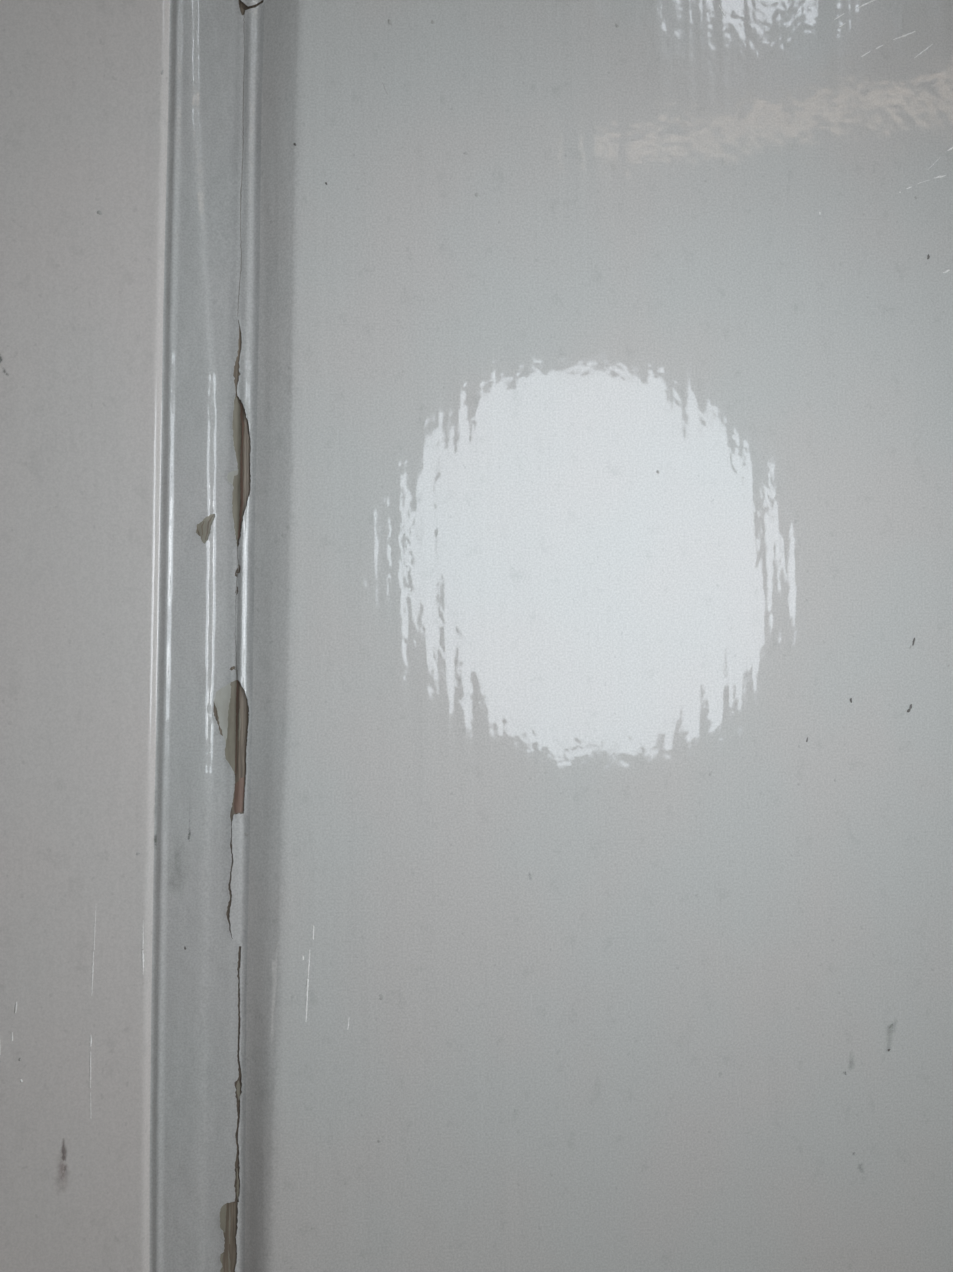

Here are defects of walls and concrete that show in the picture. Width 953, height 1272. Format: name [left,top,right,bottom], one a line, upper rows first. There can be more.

peeling [238,0,263,15]
peeling [196,514,215,544]
peeling [227,397,251,547]
peeling [213,680,249,822]
crack [226,822,242,1203]
peeling [220,1202,238,1272]